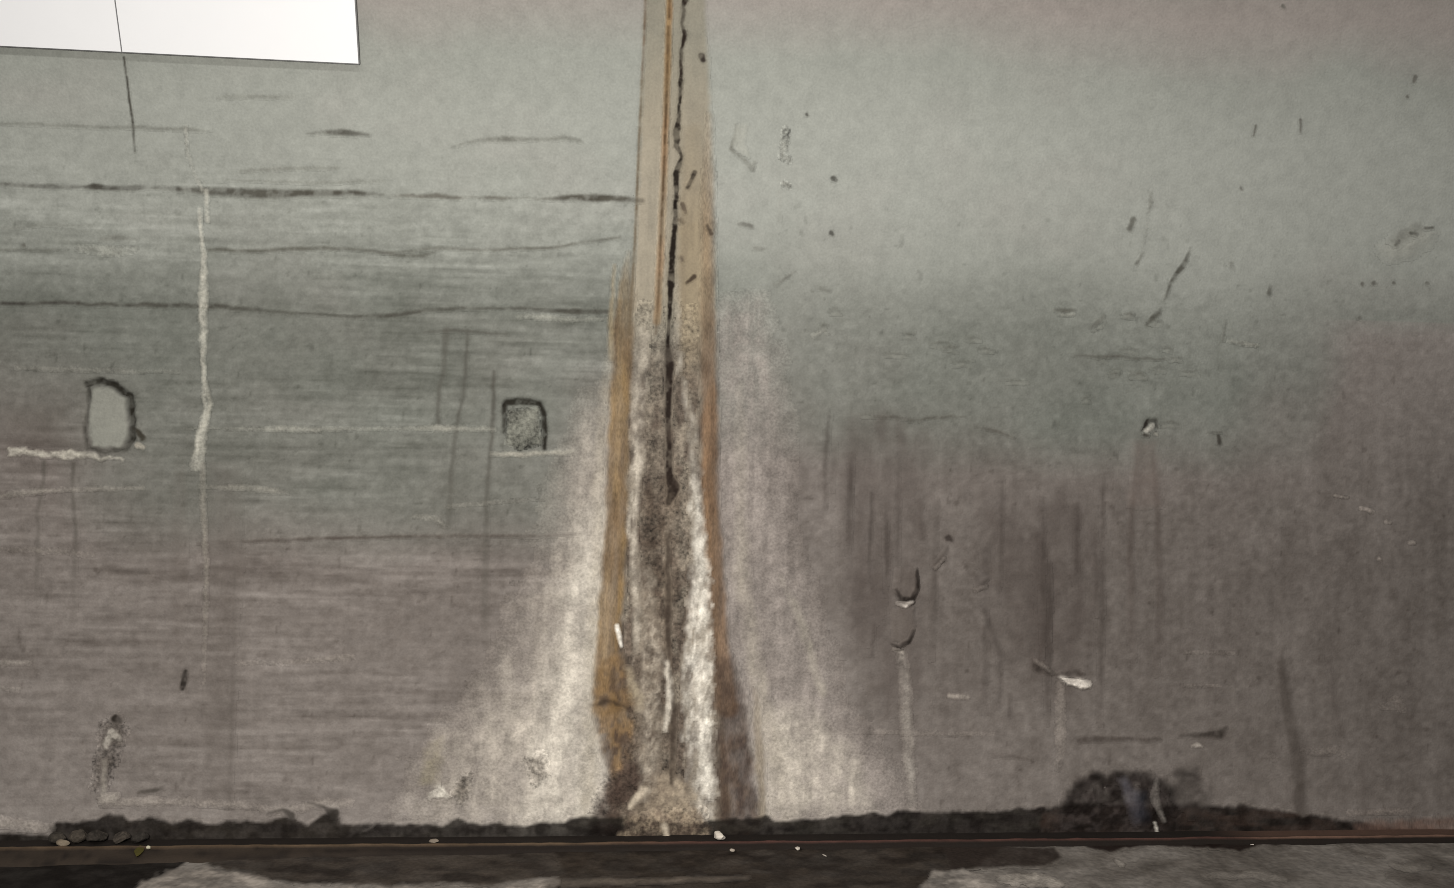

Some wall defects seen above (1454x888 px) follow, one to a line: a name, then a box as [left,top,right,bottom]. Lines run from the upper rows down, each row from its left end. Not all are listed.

spalling [5,376,148,463]
crack [0,0,689,788]
spalling [489,396,578,459]
water stain [0,124,1166,841]
corrosion [586,0,674,775]
water stain [0,862,189,888]
water stain [203,645,1454,888]
spalling [1029,658,1221,832]